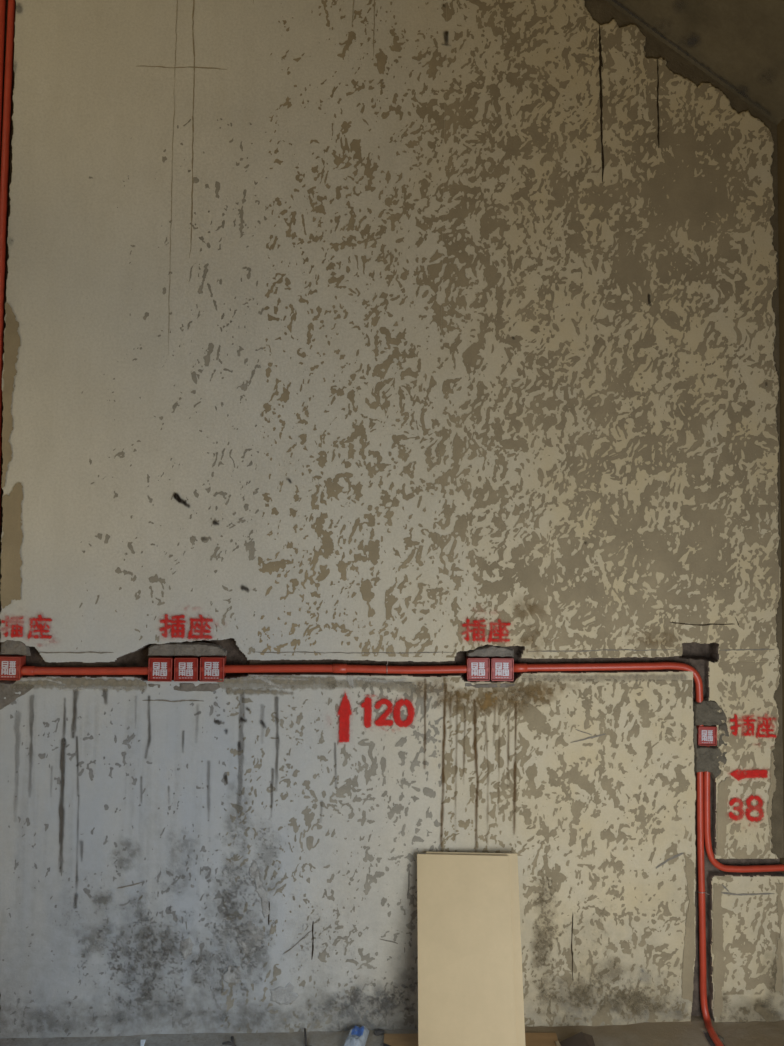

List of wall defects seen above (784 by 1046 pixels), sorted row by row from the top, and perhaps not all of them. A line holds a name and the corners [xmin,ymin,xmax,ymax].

crack [597,25,605,182]
crack [654,59,662,148]
peeling [0,303,23,609]
peeling [115,0,782,859]
damp [59,690,78,869]